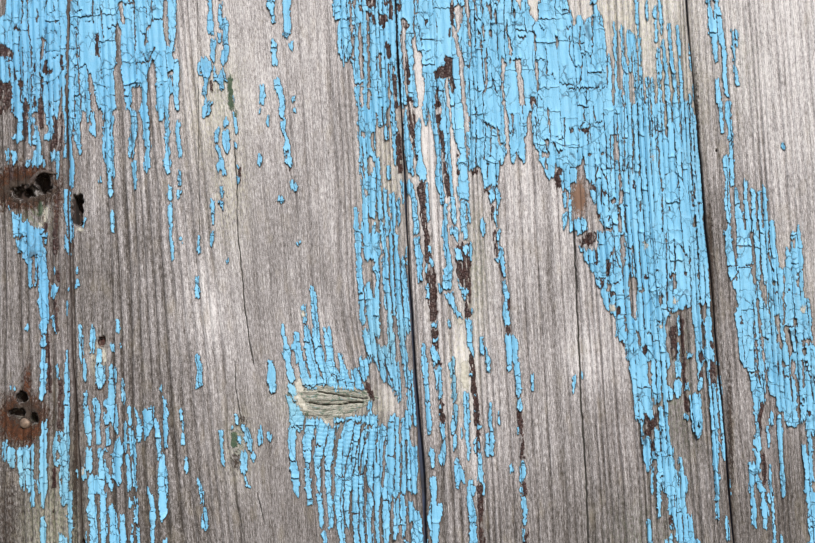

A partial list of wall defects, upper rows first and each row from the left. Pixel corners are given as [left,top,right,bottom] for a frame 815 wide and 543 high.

peeling [197,0,229,119]
peeling [266,0,294,66]
rust [0,161,63,223]
peeling [0,0,183,261]
peeling [214,112,240,184]
peeling [259,77,296,168]
crack [234,147,254,421]
peeling [281,0,730,543]
rust [0,364,54,453]
peeling [2,205,169,543]
peeling [218,413,272,488]
peeling [197,477,209,531]